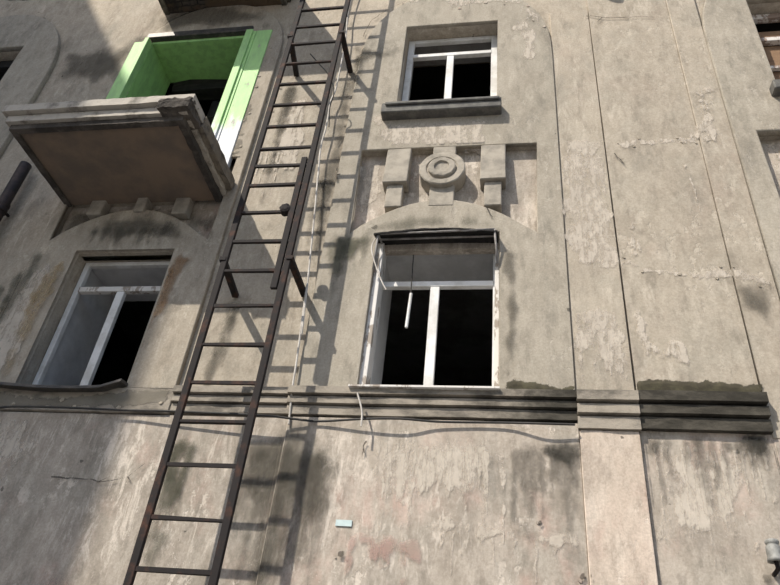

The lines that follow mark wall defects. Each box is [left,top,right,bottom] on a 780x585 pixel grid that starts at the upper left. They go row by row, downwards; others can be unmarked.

leakage [166,7,249,27]
flaking render [446,0,546,59]
leakage [0,265,53,370]
leakage [653,446,777,538]